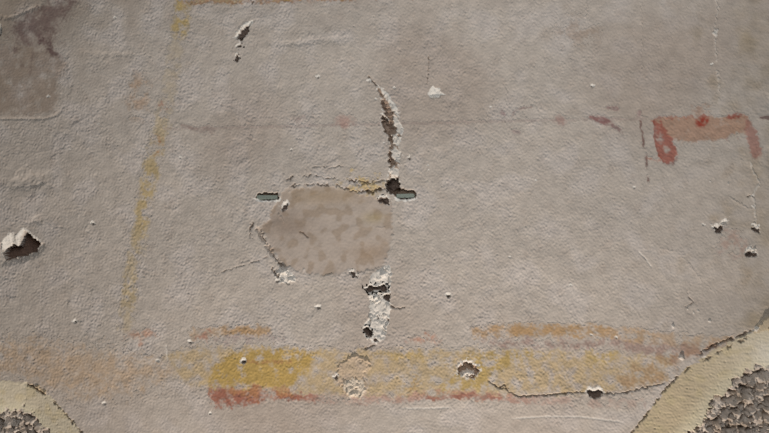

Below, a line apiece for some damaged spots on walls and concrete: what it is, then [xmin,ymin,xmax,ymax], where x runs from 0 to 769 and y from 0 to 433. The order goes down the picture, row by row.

spalling [270,266,296,285]
crack [363,265,406,350]
crack [487,380,583,397]
crack [603,327,769,433]